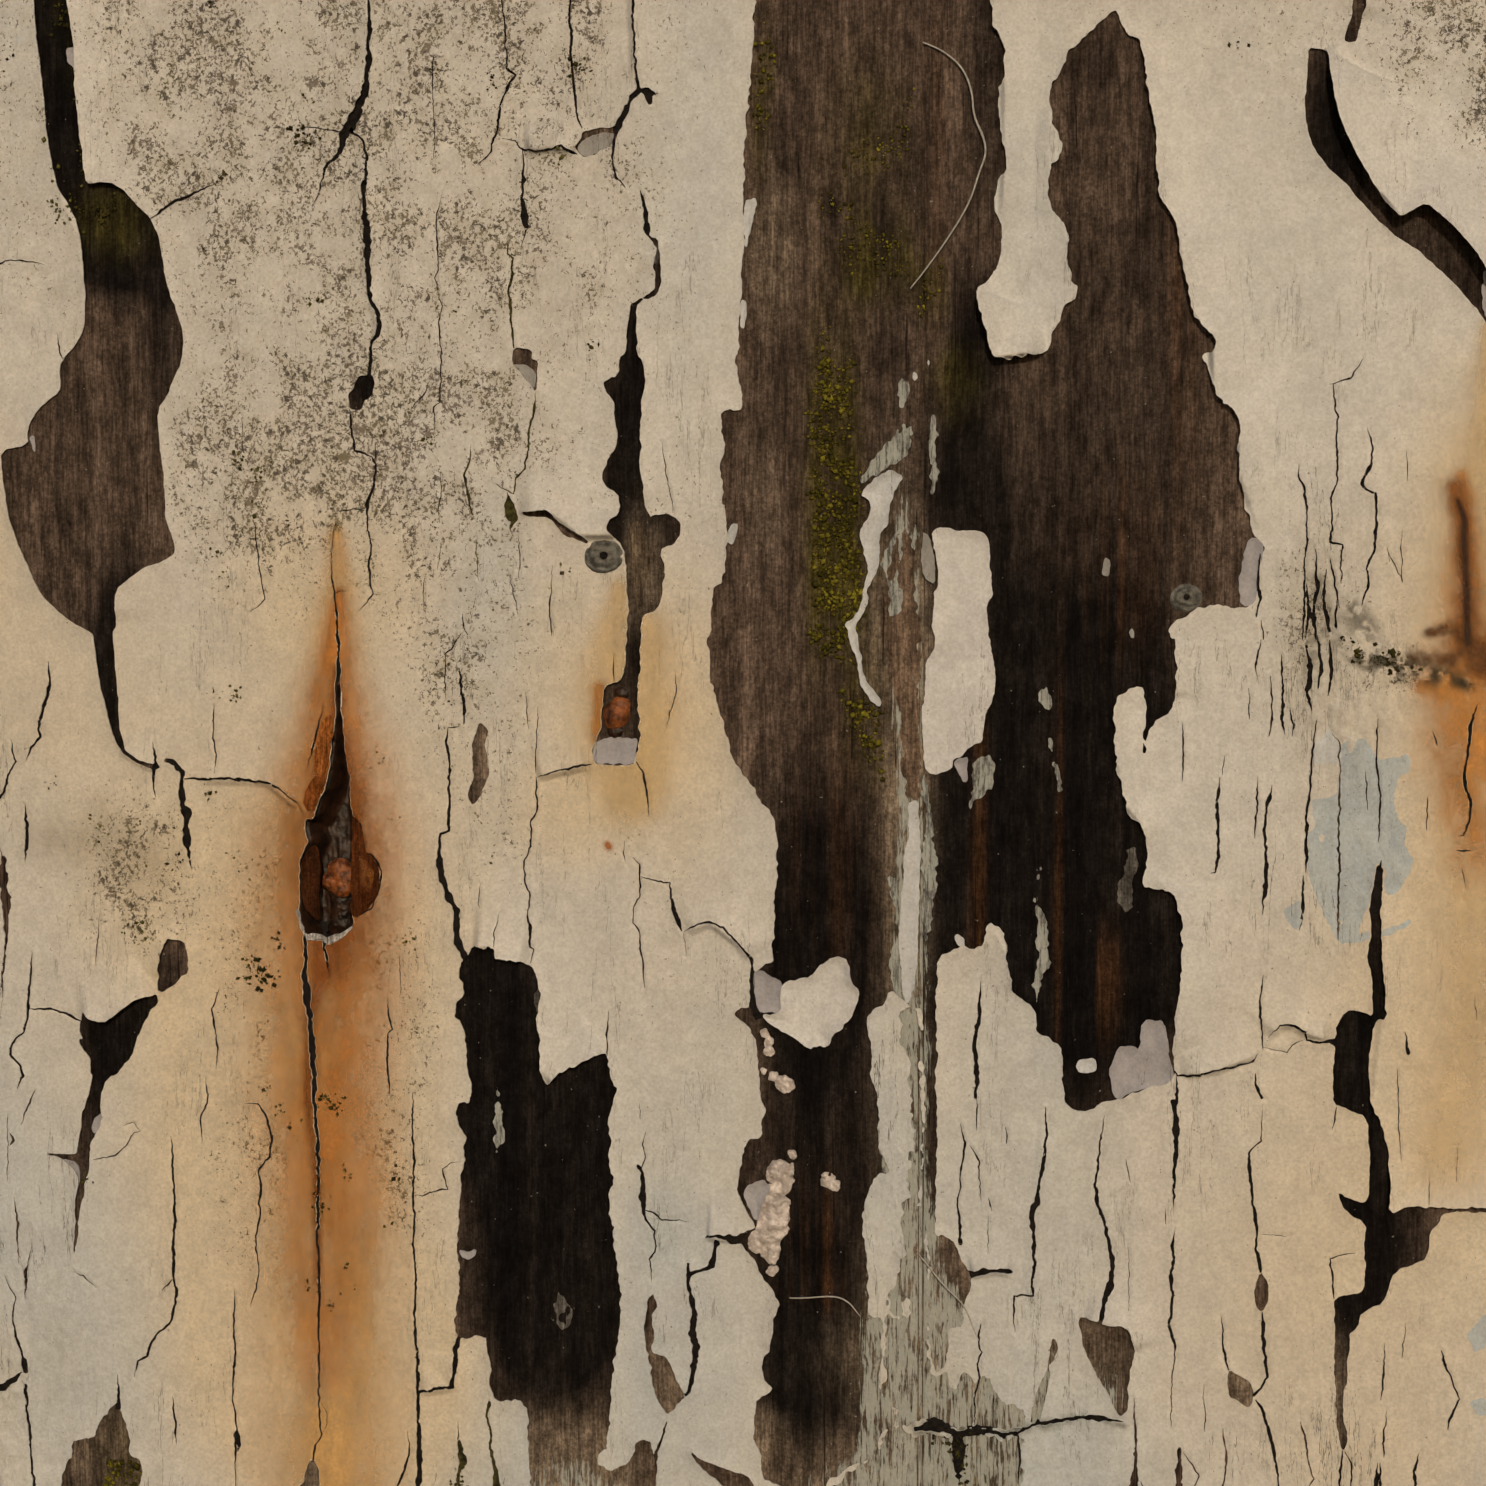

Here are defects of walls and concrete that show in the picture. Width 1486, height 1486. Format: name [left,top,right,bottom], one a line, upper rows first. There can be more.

crack [0,662,81,1486]
peeling [1,0,183,769]
corrosion [267,531,377,1486]
peeling [454,946,658,1486]
crack [480,0,658,348]
corrosion [593,585,665,813]
peeling [692,0,1265,1486]
crack [914,975,1420,1486]
crack [1212,359,1408,937]
peeling [1305,48,1486,322]
peeling [1325,900,1486,1450]
corrosion [1409,325,1486,917]